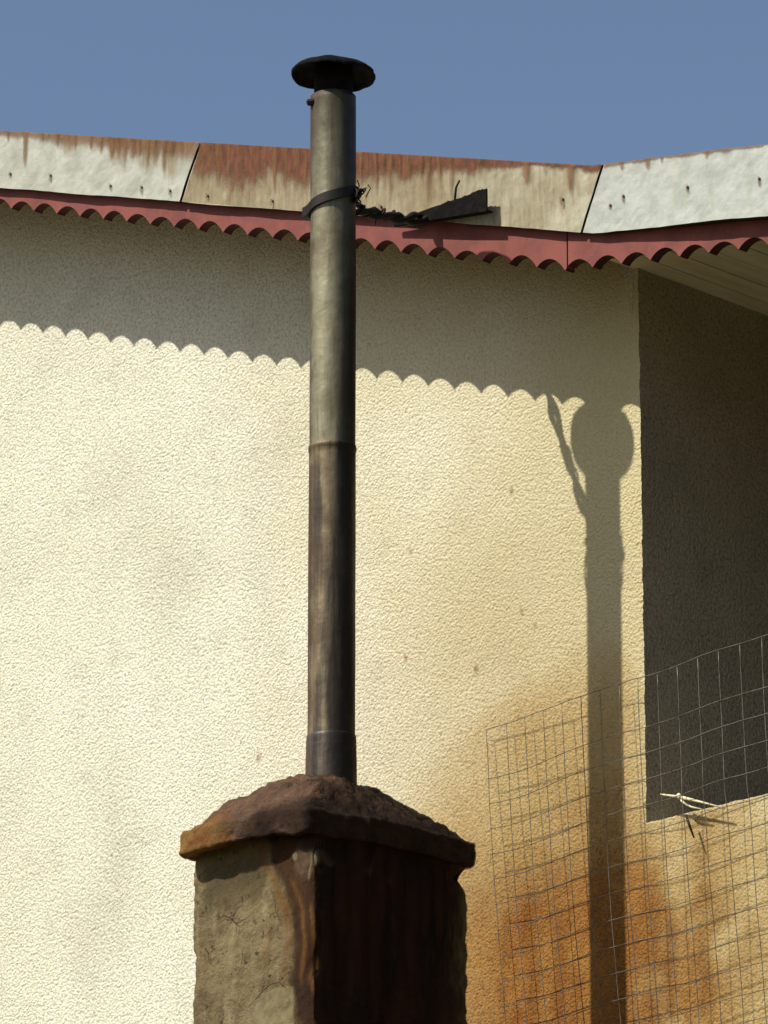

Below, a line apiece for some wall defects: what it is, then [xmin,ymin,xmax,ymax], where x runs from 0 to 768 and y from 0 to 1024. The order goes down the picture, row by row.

rust [0,130,310,190]
rust [356,144,767,193]
rust [261,834,322,1024]